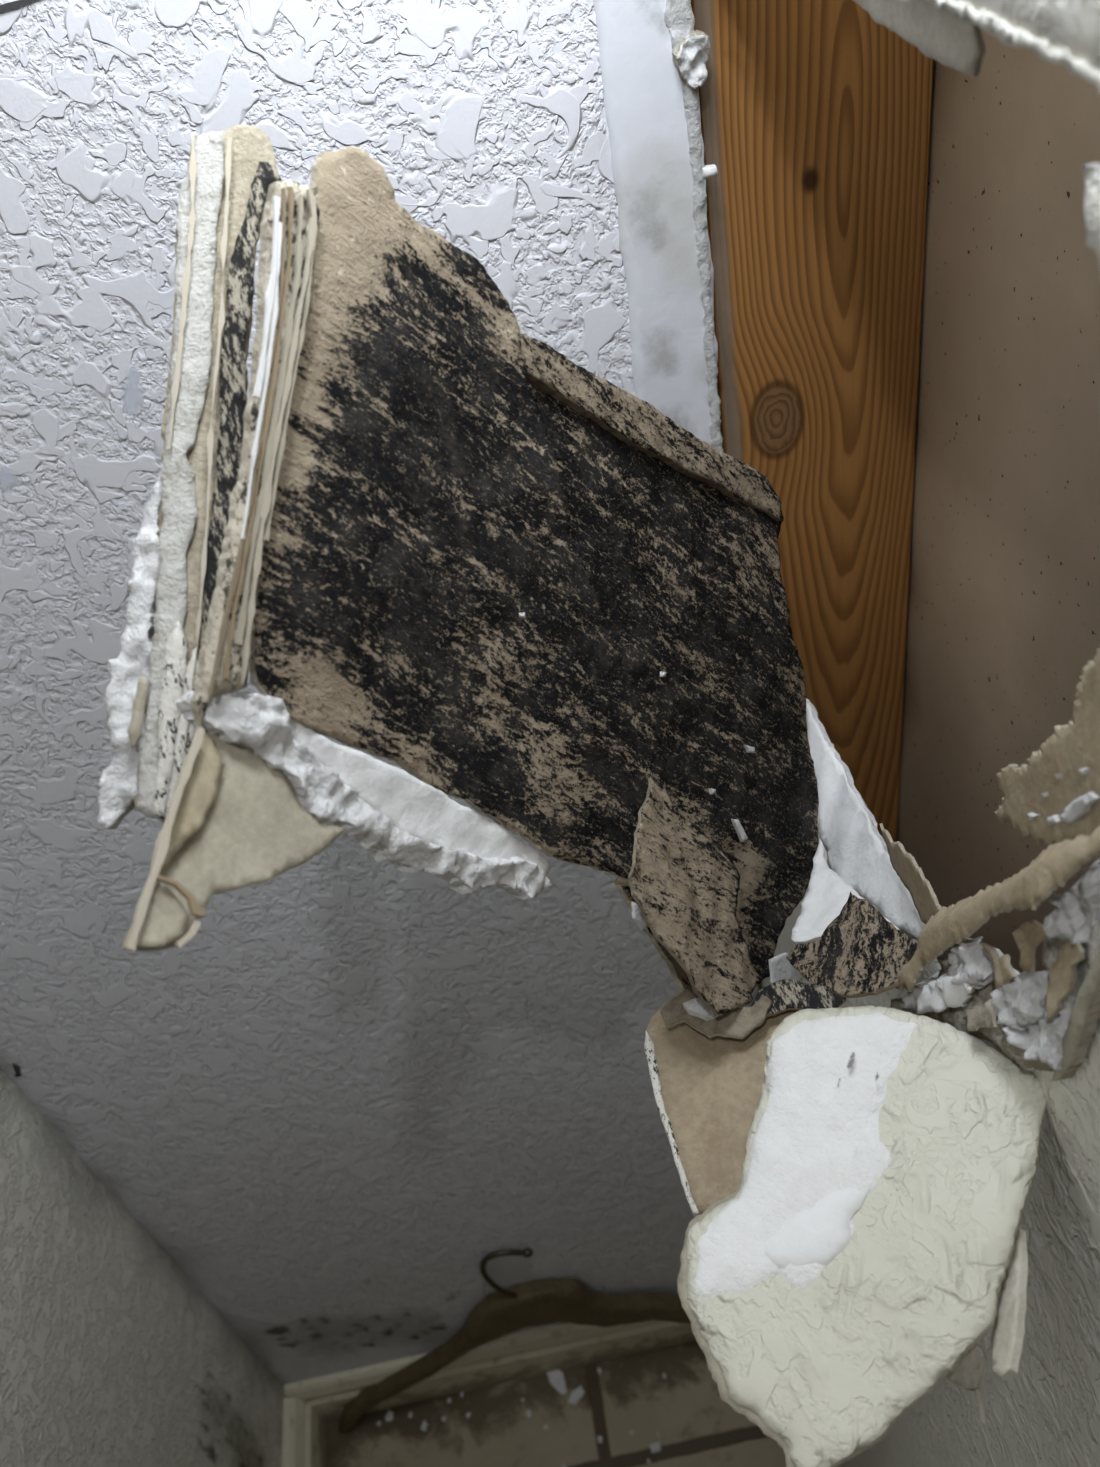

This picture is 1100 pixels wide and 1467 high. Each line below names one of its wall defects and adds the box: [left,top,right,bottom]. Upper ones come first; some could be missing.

crack [0,0,37,13]
spalling [929,0,1100,95]
spalling [664,0,724,452]
spalling [175,691,552,900]
leakage [751,979,847,1018]
spalling [1052,945,1100,1081]
flaking render [694,1012,918,1299]
peeling [546,1370,585,1405]